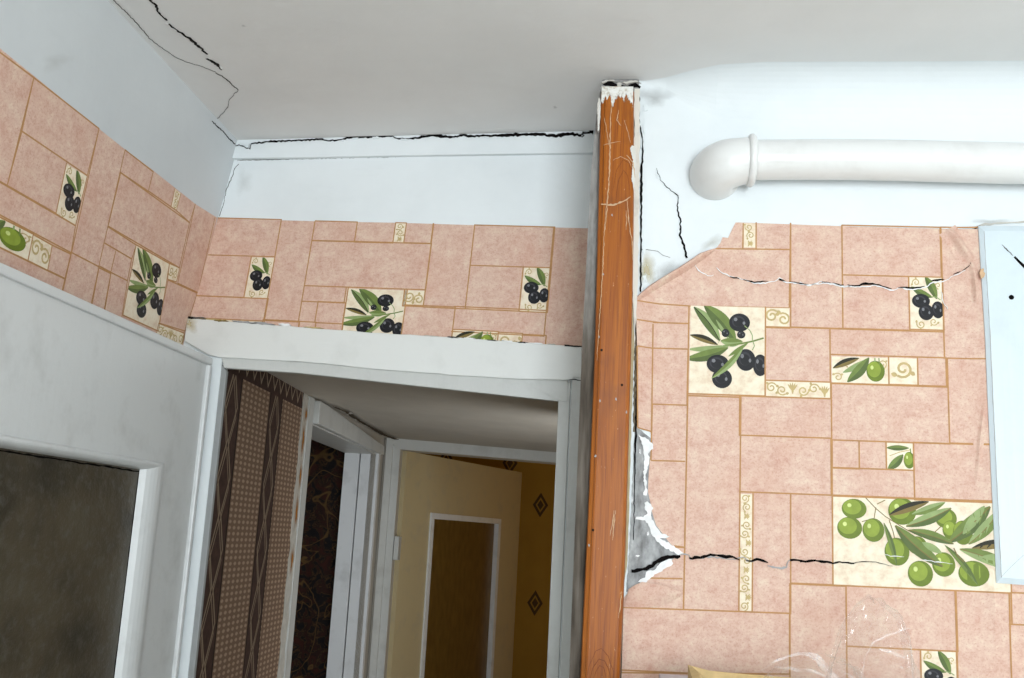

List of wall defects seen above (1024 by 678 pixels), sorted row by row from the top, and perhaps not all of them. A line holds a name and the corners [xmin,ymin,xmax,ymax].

crack [114,0,594,216]
crack [639,88,971,309]
crack [631,324,639,540]
peeling [626,428,683,592]
crack [631,553,950,573]